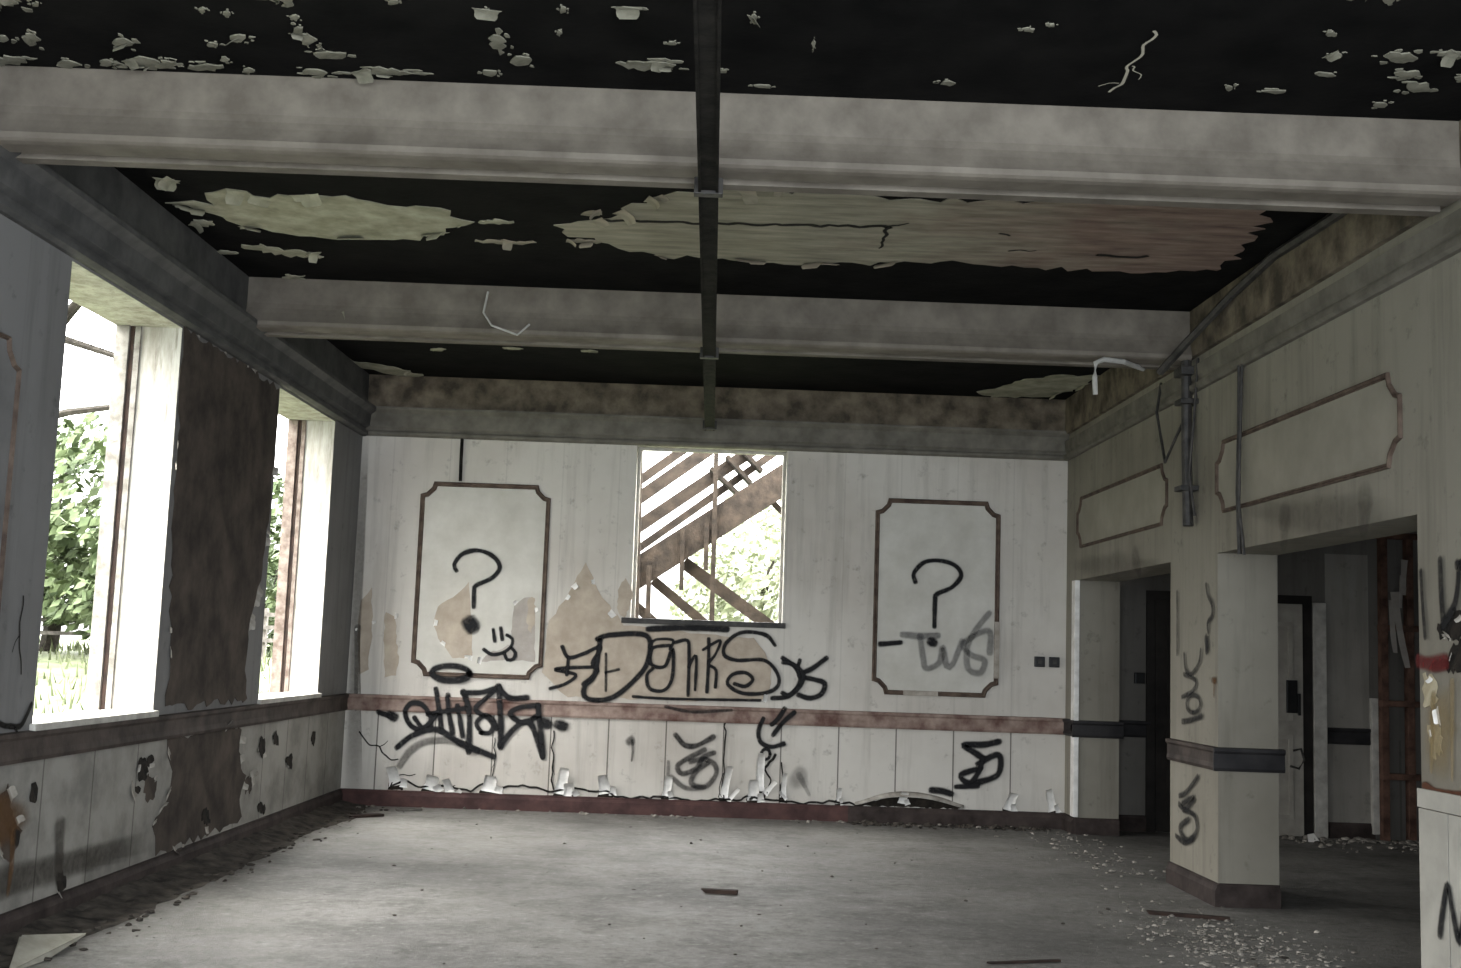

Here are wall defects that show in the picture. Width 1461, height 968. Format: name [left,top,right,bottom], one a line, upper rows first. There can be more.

peeling [0,0,44,66]
peeling [56,6,255,75]
peeling [270,0,433,84]
peeling [472,6,534,77]
peeling [611,6,649,19]
peeling [616,40,689,73]
peeling [1371,49,1461,109]
peeling [152,176,537,280]
peeling [554,190,1273,273]
peeling [433,563,772,703]
peeling [1422,610,1461,760]
peeling [386,766,503,794]